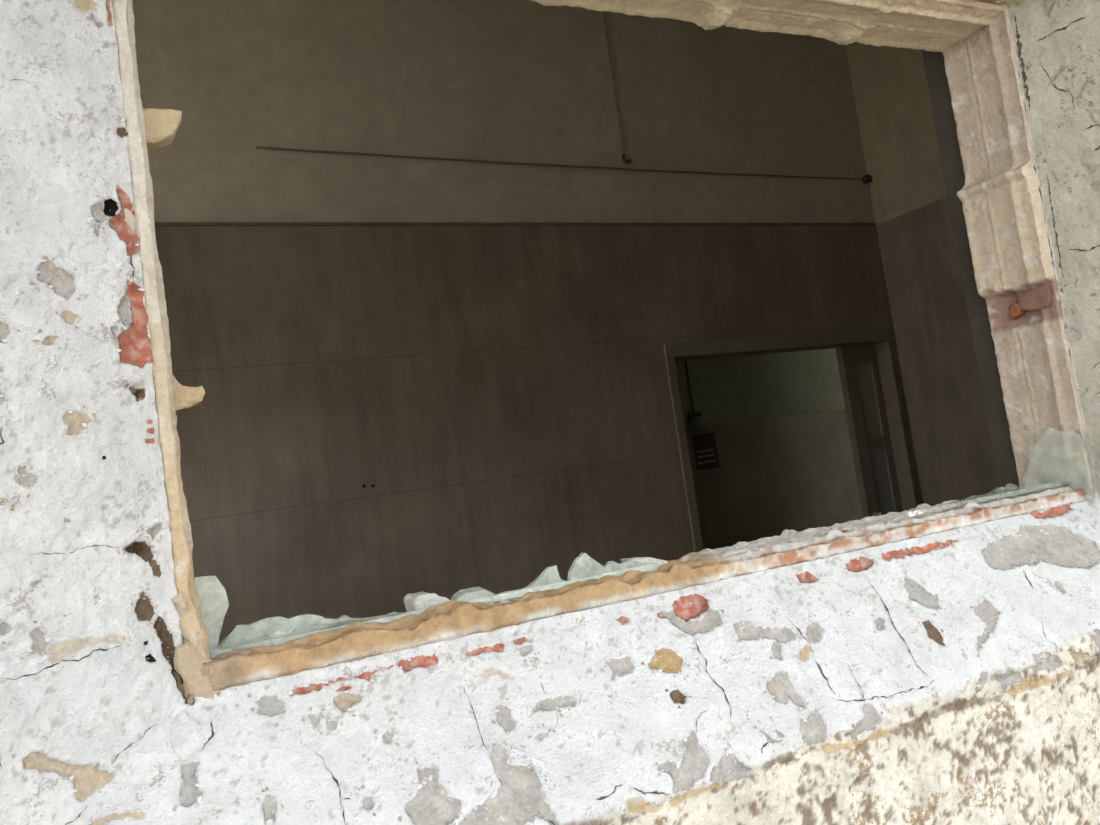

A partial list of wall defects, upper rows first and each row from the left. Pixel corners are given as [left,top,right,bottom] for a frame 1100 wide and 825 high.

crack [993,0,1100,151]
flaking render [91,184,140,256]
crack [1047,174,1100,277]
flaking render [101,279,153,368]
peeling [981,501,1100,570]
crack [1,646,119,680]
crack [696,643,731,733]
peeling [657,594,829,752]
crack [787,582,935,702]
peeling [12,753,115,801]
crack [315,751,351,824]
peeling [398,743,559,825]